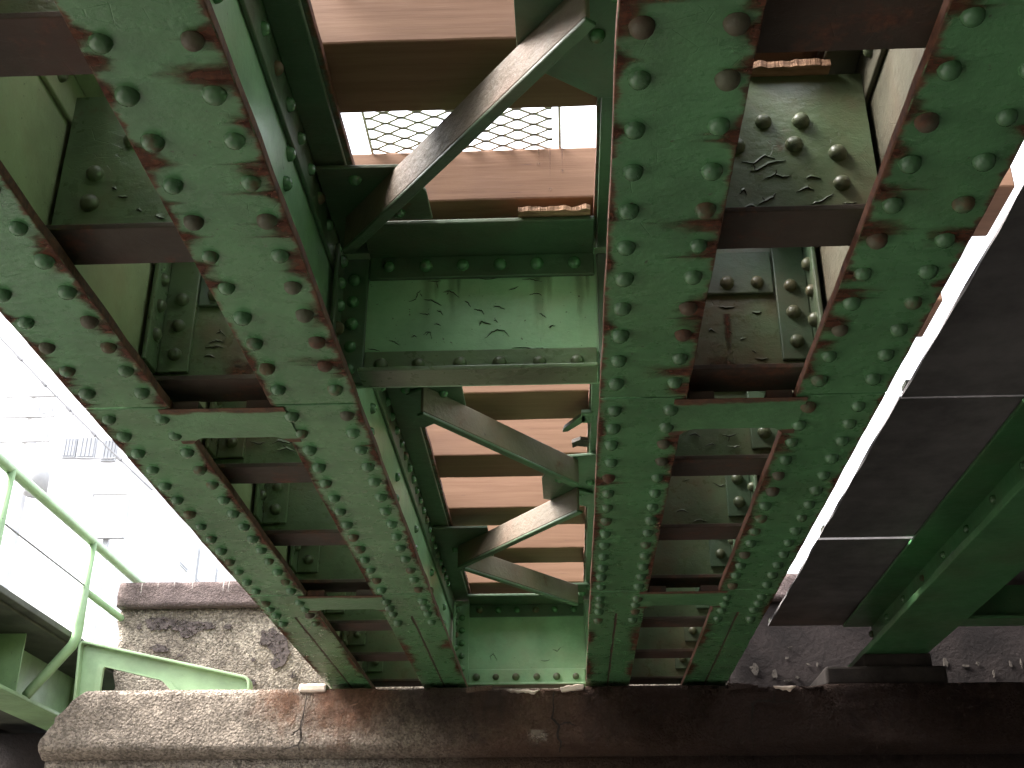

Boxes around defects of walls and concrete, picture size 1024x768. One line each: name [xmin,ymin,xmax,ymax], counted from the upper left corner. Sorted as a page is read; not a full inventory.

rust [947,0,985,15]
rust [67,25,117,106]
rust [176,64,235,86]
rust [924,56,952,74]
rust [132,145,167,172]
rust [874,186,905,200]
rust [858,221,898,241]
rust [936,229,975,243]
rust [815,269,864,350]
peeling [137,617,232,638]
peeling [259,627,296,678]
crack [284,696,307,751]